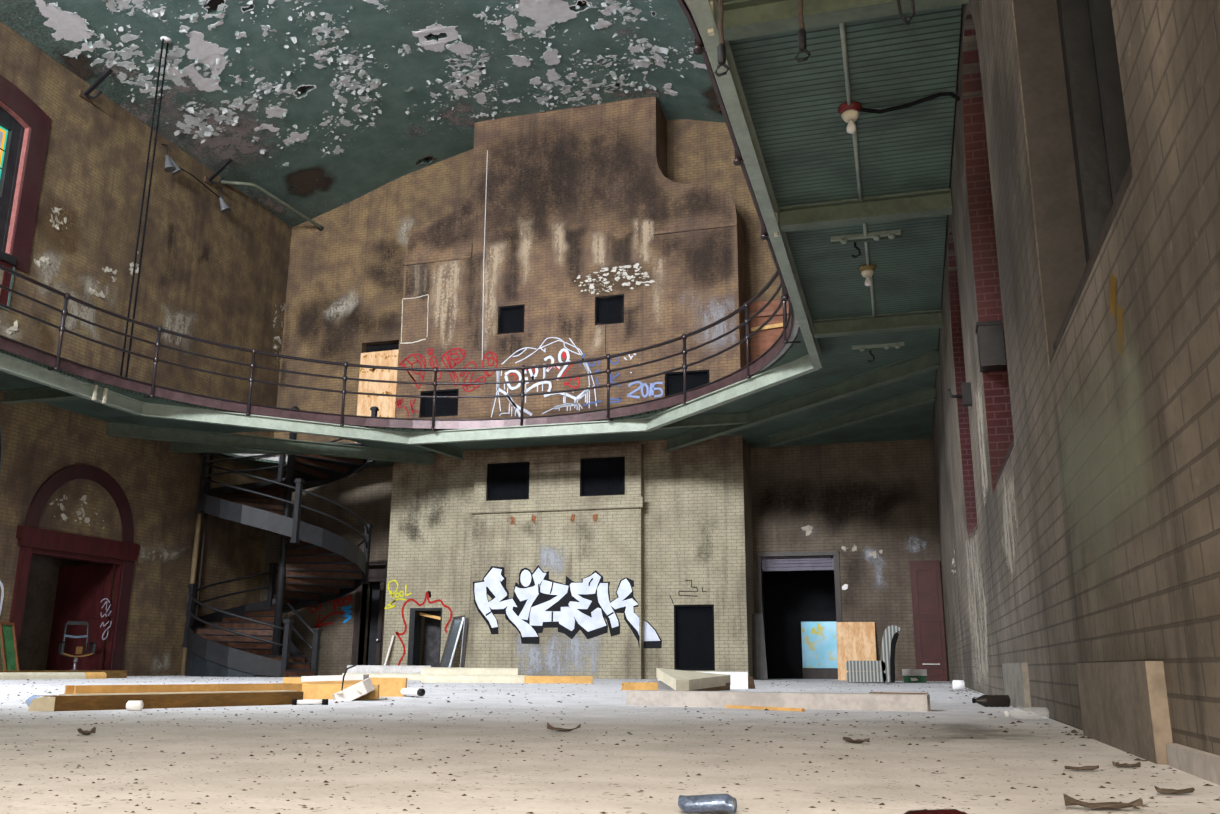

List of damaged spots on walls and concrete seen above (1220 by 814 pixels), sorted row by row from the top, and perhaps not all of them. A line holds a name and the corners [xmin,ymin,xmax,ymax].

peeling [392,0,707,124]
flaking render [35,0,388,196]
water stain [555,221,662,277]
water stain [328,294,355,316]
water stain [414,221,532,354]
spalling [572,263,655,294]
water stain [704,306,734,340]
peeling [50,495,105,529]